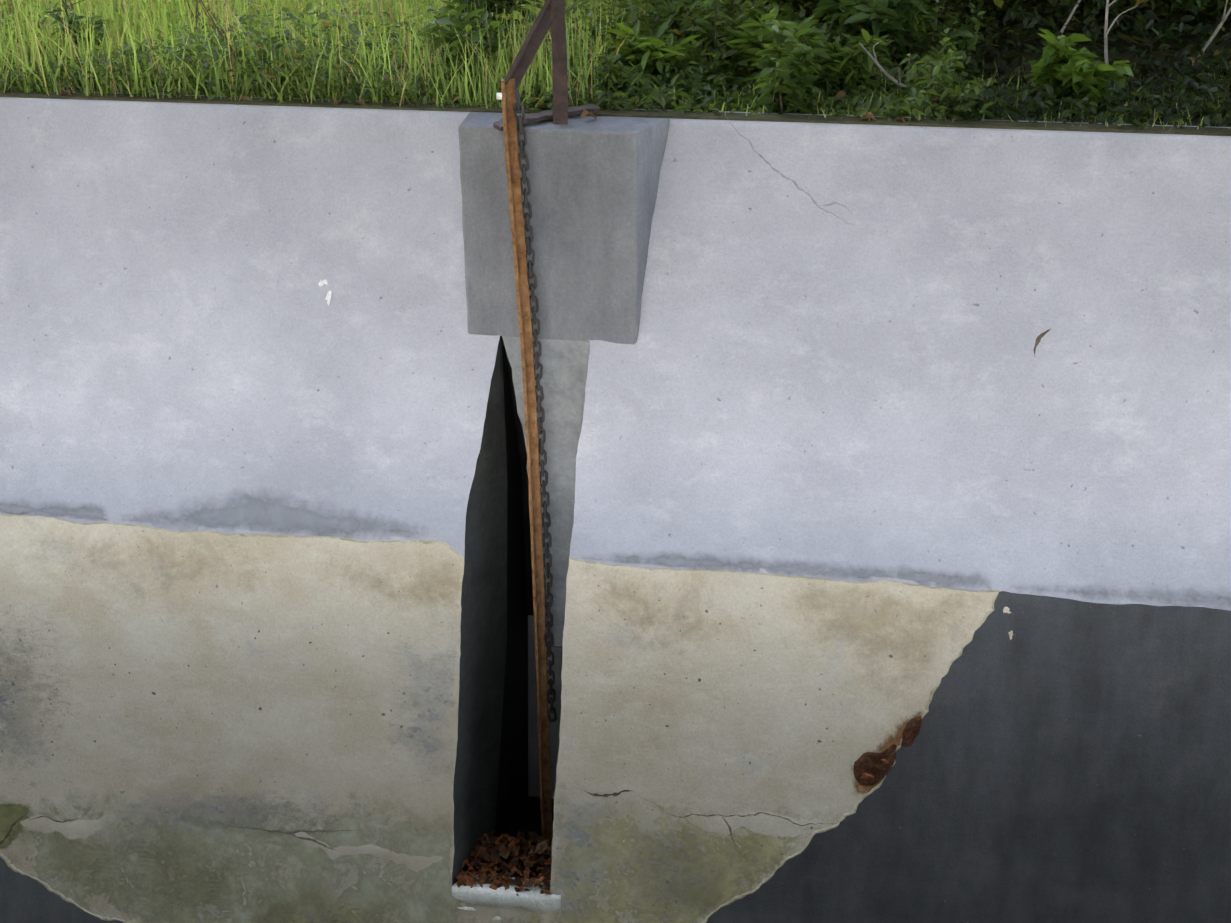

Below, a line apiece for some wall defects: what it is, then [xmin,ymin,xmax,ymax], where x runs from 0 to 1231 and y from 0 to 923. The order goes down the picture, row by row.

crack [724,114,854,225]
peeling [0,513,1011,923]
corrosion [876,712,921,753]
crack [0,814,82,845]
crack [204,821,358,851]
crack [585,790,836,849]